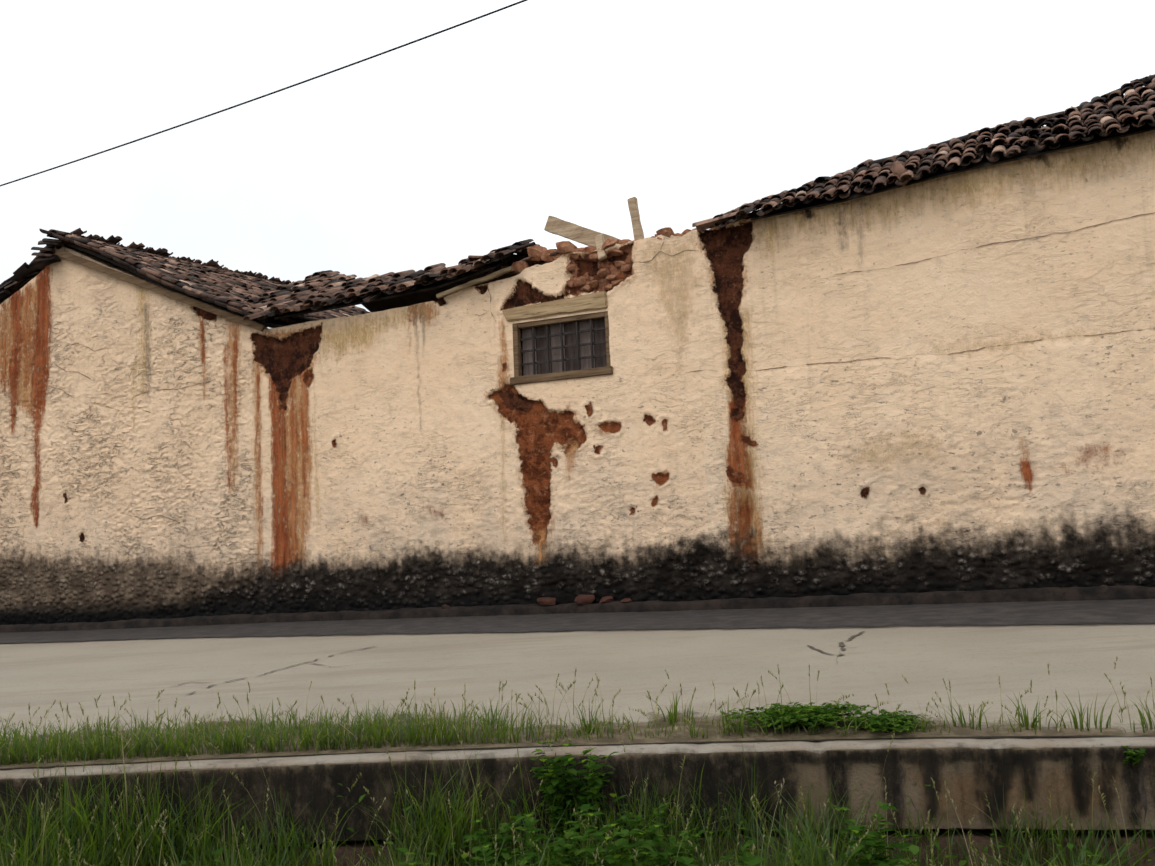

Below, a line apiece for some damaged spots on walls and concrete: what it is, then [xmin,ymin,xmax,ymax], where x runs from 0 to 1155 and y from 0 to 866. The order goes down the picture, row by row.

corrosion [0,265,51,527]
corrosion [223,323,240,491]
corrosion [252,361,312,573]
spalling [250,322,322,410]
spalling [468,242,633,310]
spalling [488,383,621,561]
spalling [643,414,667,431]
spalling [650,470,669,507]
spalling [699,220,755,411]
crack [749,328,1151,371]
crack [836,213,1153,275]
damp [0,512,1155,625]